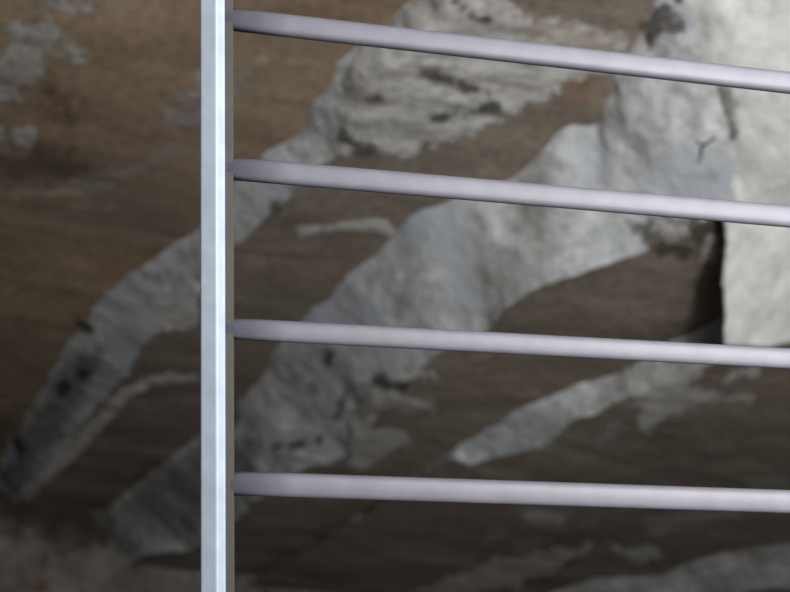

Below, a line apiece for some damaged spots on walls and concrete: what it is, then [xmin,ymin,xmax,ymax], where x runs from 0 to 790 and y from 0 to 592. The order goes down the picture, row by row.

peeling [0,0,120,105]
peeling [395,0,629,53]
peeling [159,70,200,129]
peeling [327,46,605,160]
crack [695,136,715,164]
peeling [296,219,395,238]
peeling [651,218,724,263]
peeling [152,303,200,333]
peeling [18,372,200,501]
peeling [347,366,439,471]
peeling [621,362,761,435]
peeling [416,539,593,592]